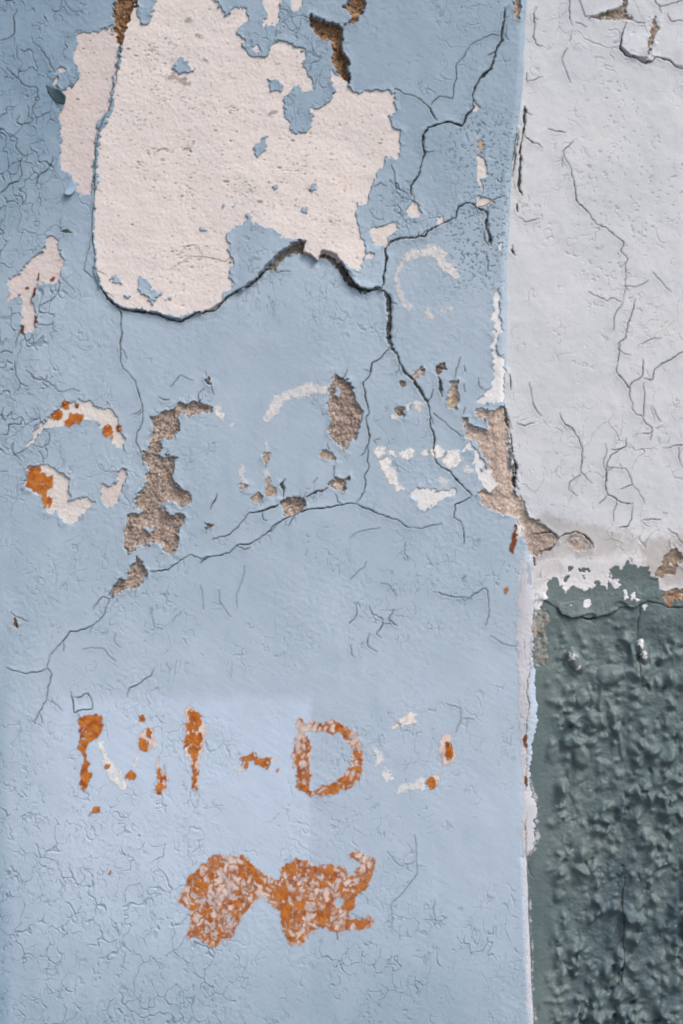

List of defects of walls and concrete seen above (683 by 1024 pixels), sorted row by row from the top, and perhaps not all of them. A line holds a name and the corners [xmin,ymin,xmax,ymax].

peeling [46,0,401,317]
crack [378,9,507,205]
crack [619,0,683,57]
peeling [7,236,65,333]
peeling [23,464,128,524]
peeling [26,398,126,449]
crack [1,50,289,464]
flaking render [109,400,213,599]
flaking render [319,375,363,460]
crack [151,106,683,617]
rust [509,524,518,553]
crack [434,576,539,790]